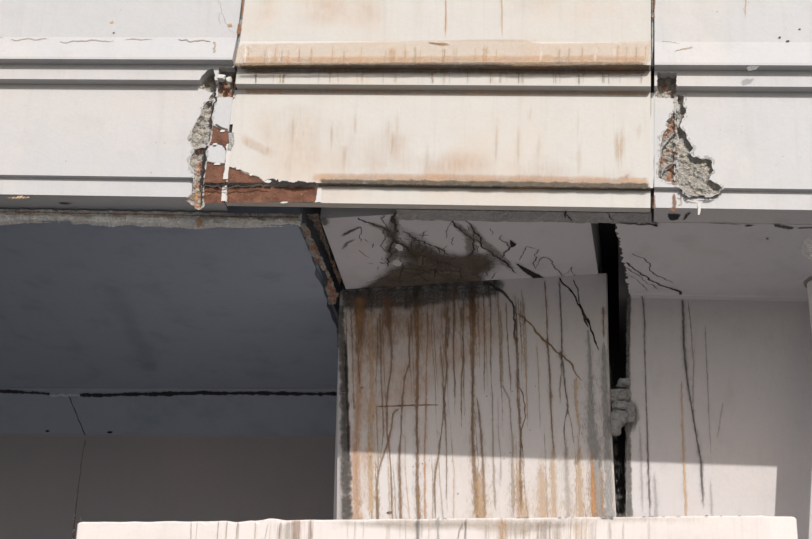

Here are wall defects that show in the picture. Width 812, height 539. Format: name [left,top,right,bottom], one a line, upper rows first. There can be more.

crack [11,36,145,44]
spalling [0,74,342,305]
corrosion [240,62,649,74]
spalling [656,94,724,197]
corrosion [346,298,374,520]
water stain [337,218,528,526]
crack [358,213,599,506]
water stain [537,282,614,518]
water stain [625,422,633,517]
crack [626,254,703,492]